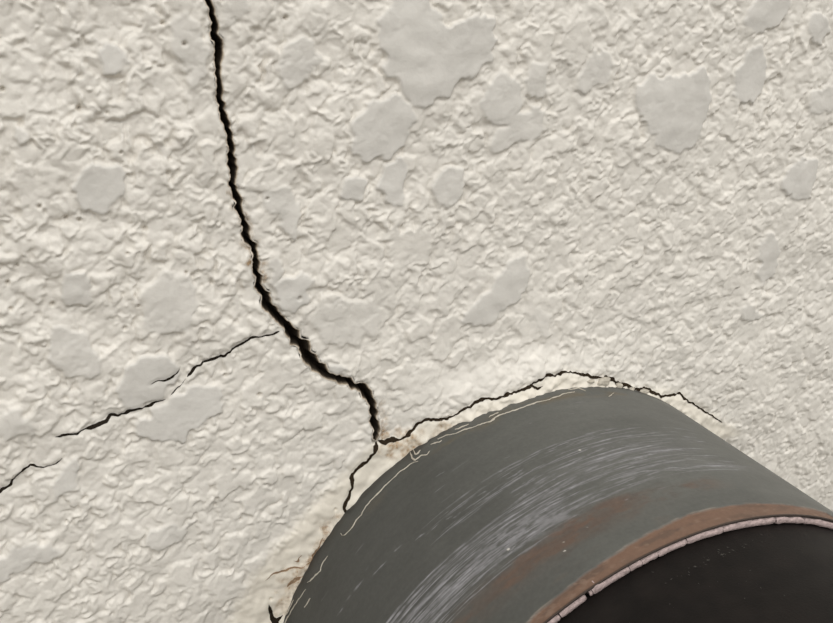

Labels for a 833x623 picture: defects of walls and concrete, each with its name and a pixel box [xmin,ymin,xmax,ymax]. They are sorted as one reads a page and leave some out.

crack [56,0,722,513]
crack [0,461,59,493]
crack [265,538,323,587]
crack [268,605,283,623]